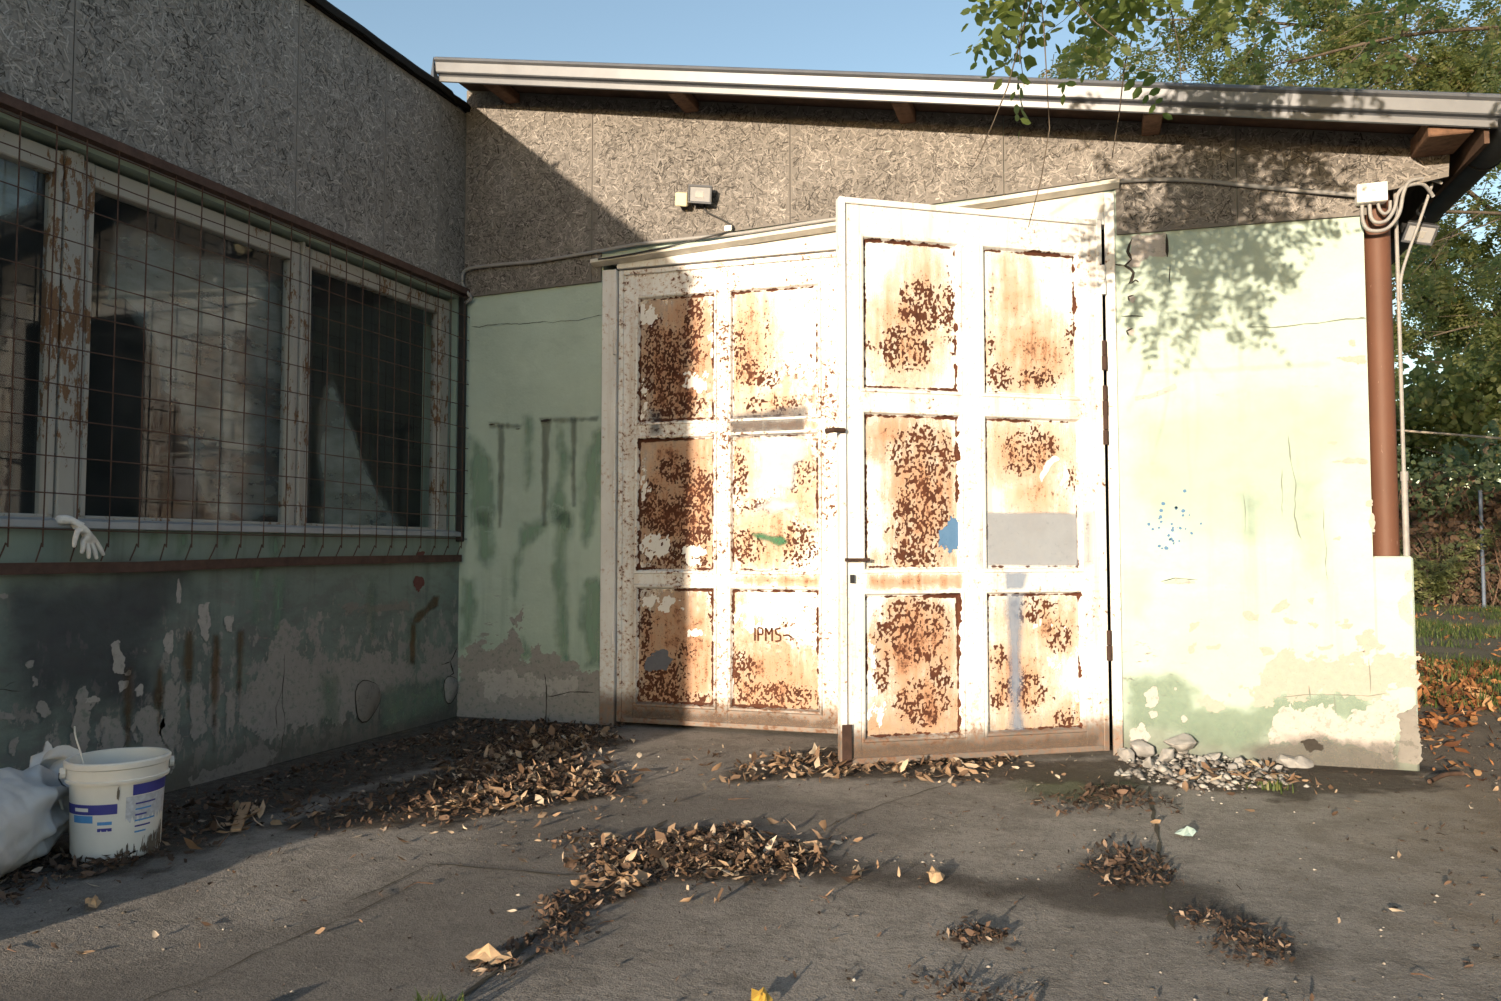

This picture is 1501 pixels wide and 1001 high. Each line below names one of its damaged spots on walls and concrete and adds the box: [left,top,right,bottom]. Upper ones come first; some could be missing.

rust [863,238,958,392]
rust [983,249,1078,395]
peeling [25,660,51,718]
peeling [176,579,234,642]
flaking render [70,604,600,786]
damp [470,418,601,663]
rust [626,286,832,728]
rust [855,414,1097,758]
flaking render [1129,686,1177,743]
flaking render [1181,599,1424,765]